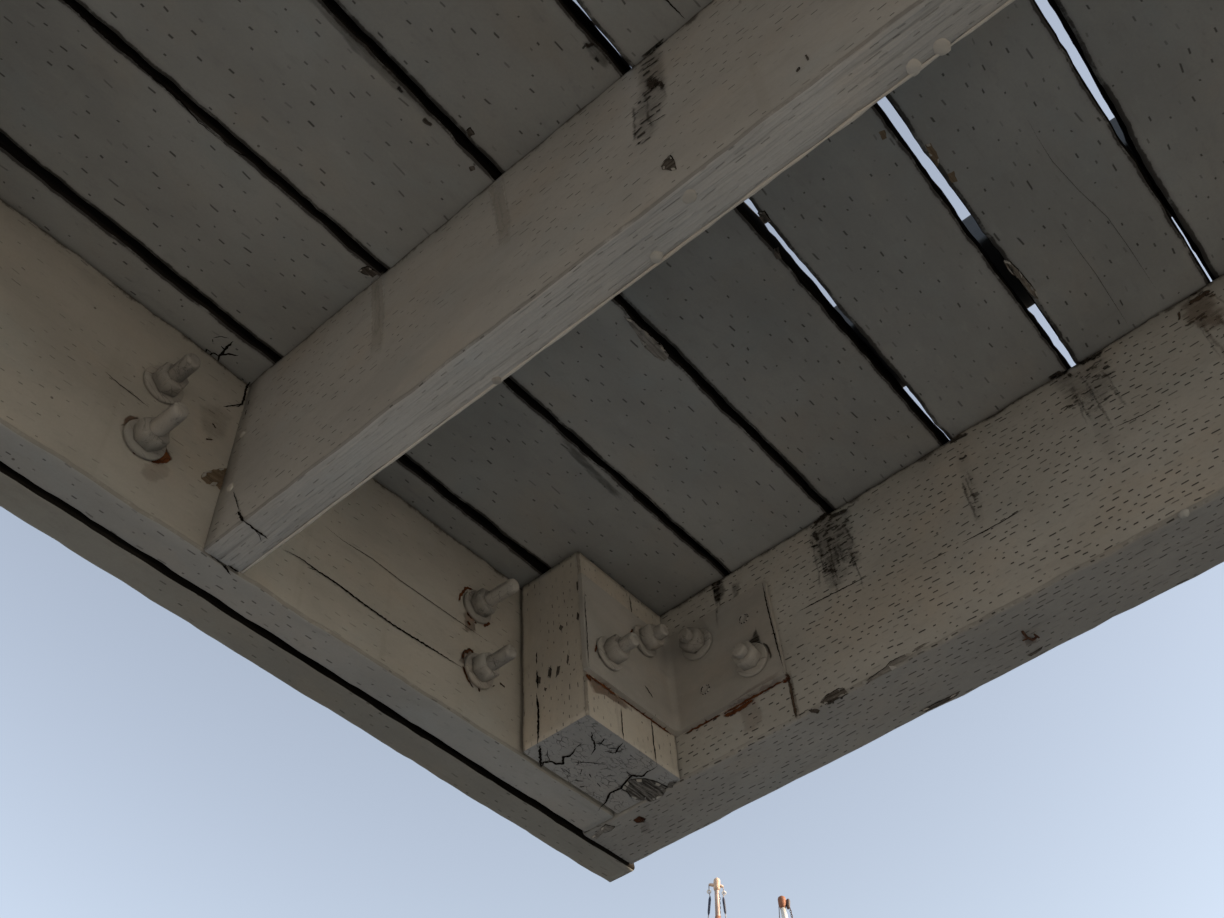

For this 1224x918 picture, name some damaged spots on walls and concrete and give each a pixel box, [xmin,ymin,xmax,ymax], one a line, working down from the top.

water stain [634,39,665,144]
water stain [1178,290,1216,326]
crack [205,336,238,361]
crack [223,382,250,414]
water stain [1049,352,1115,400]
rust [152,448,172,464]
water stain [811,509,856,573]
crack [233,492,461,667]
crack [330,530,489,642]
crack [536,653,657,811]
rust [586,674,670,734]
rust [685,674,797,734]